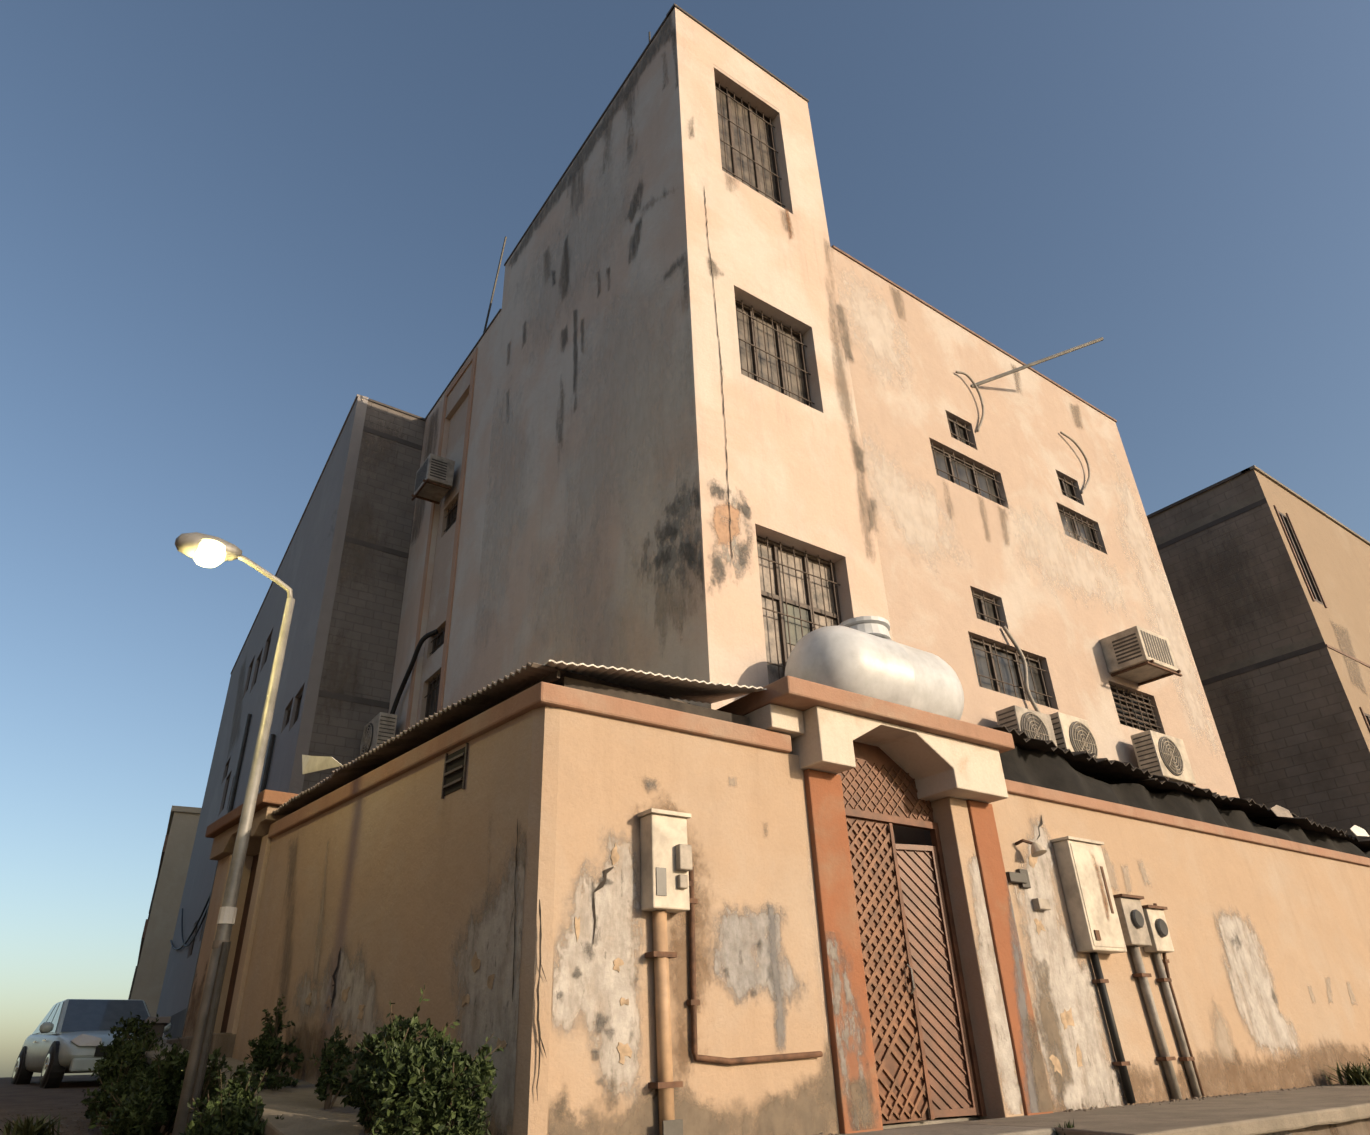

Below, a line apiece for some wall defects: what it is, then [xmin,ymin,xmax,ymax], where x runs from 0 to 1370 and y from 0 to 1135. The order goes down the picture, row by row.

leakage [545,236,568,298]
leakage [627,184,643,263]
leakage [561,310,583,418]
leakage [641,484,751,587]
crack [592,867,614,944]
crack [331,947,341,1007]
peeling [453,843,526,1134]
peeling [552,837,643,1095]
peeling [714,905,799,1047]
peeling [1015,821,1122,1110]
peeling [1215,913,1297,1053]